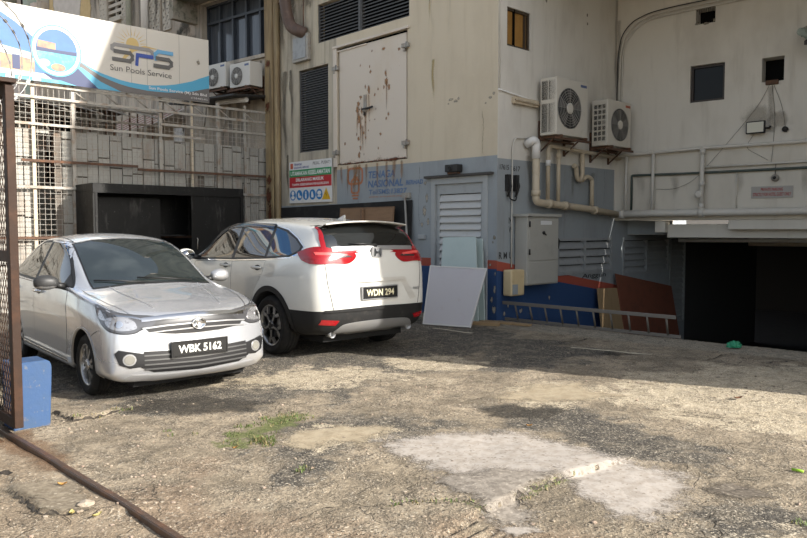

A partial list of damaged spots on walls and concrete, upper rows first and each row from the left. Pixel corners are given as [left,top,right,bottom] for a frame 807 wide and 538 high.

corrosion [338,71,406,165]
crack [52,407,127,421]
crack [0,470,89,525]